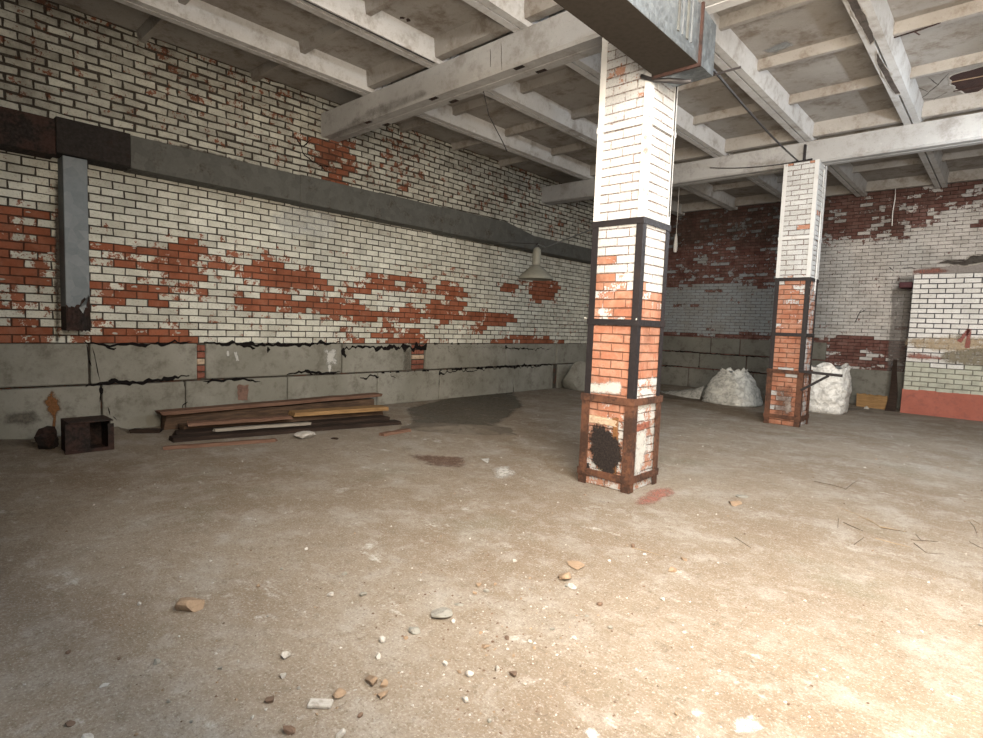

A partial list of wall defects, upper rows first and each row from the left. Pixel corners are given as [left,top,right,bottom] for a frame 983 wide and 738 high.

spalling [947,65,983,94]
peeling [314,138,362,185]
peeling [0,205,56,286]
peeling [0,300,61,343]
peeling [89,237,208,308]
peeling [195,255,566,344]
peeling [584,255,662,327]
peeling [663,202,805,344]
peeling [822,180,983,241]
crack [84,339,552,420]
peeling [812,335,910,380]